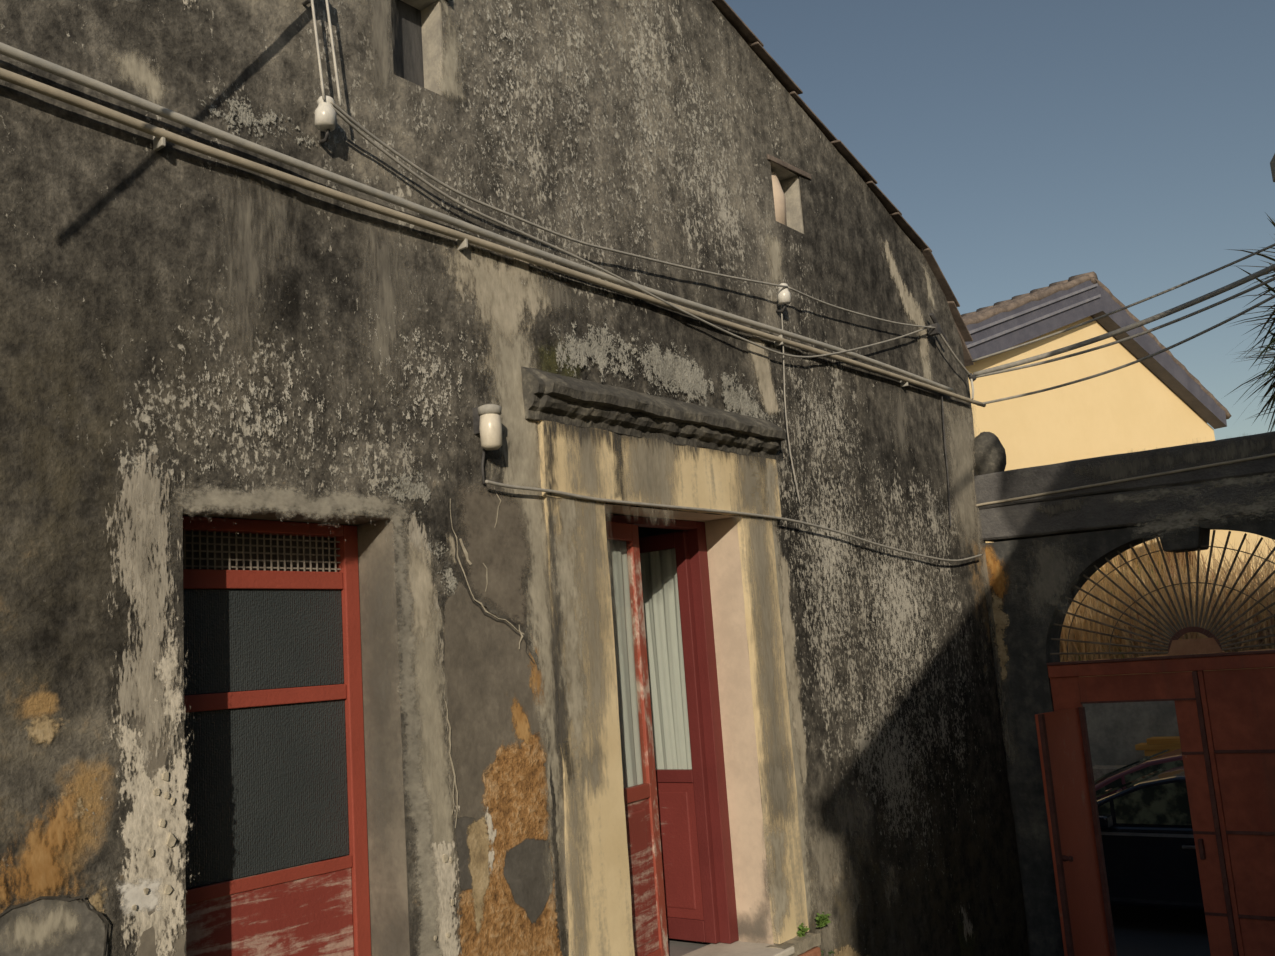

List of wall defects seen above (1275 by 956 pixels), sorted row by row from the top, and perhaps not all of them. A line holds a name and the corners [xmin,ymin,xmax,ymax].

leakage [224,180,295,347]
spalling [102,284,569,956]
leakage [364,225,414,382]
leakage [444,243,870,956]
leakage [890,392,908,450]
leakage [945,407,1008,740]